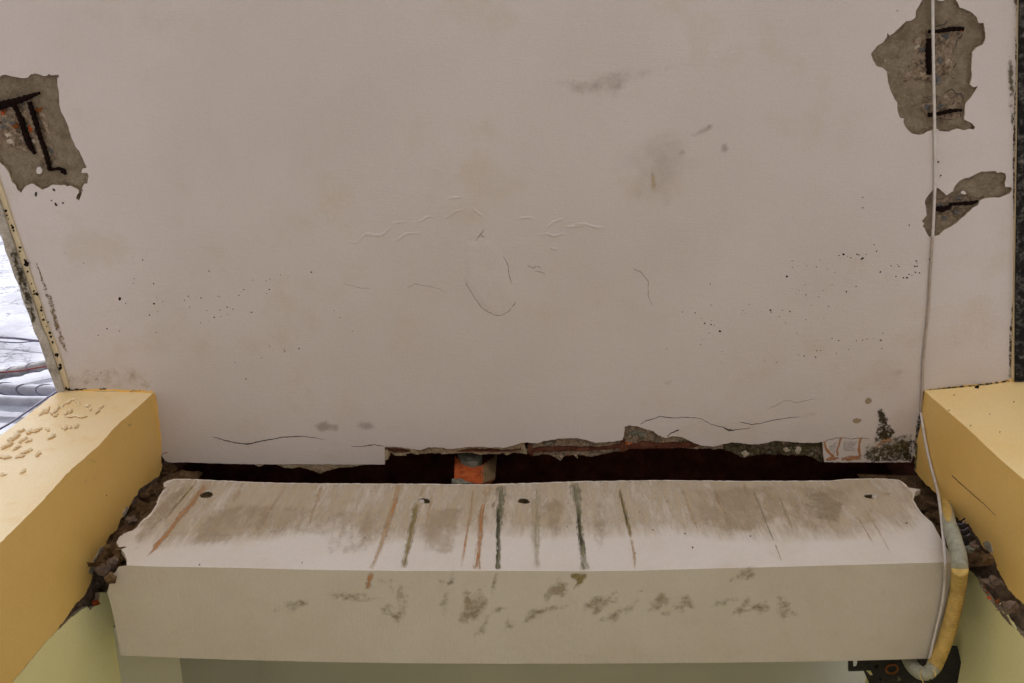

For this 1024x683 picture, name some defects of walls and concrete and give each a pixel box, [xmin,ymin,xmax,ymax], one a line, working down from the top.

spalling [871,0,984,134]
spalling [0,73,89,206]
spalling [922,171,1011,236]
water stain [11,246,66,370]
crack [213,436,327,445]
spalling [385,425,823,462]
crack [641,416,793,437]
corrosion [824,438,862,461]
water stain [865,398,921,469]
corrosion [366,486,399,588]
corrosion [462,487,489,569]
water stain [164,479,899,594]